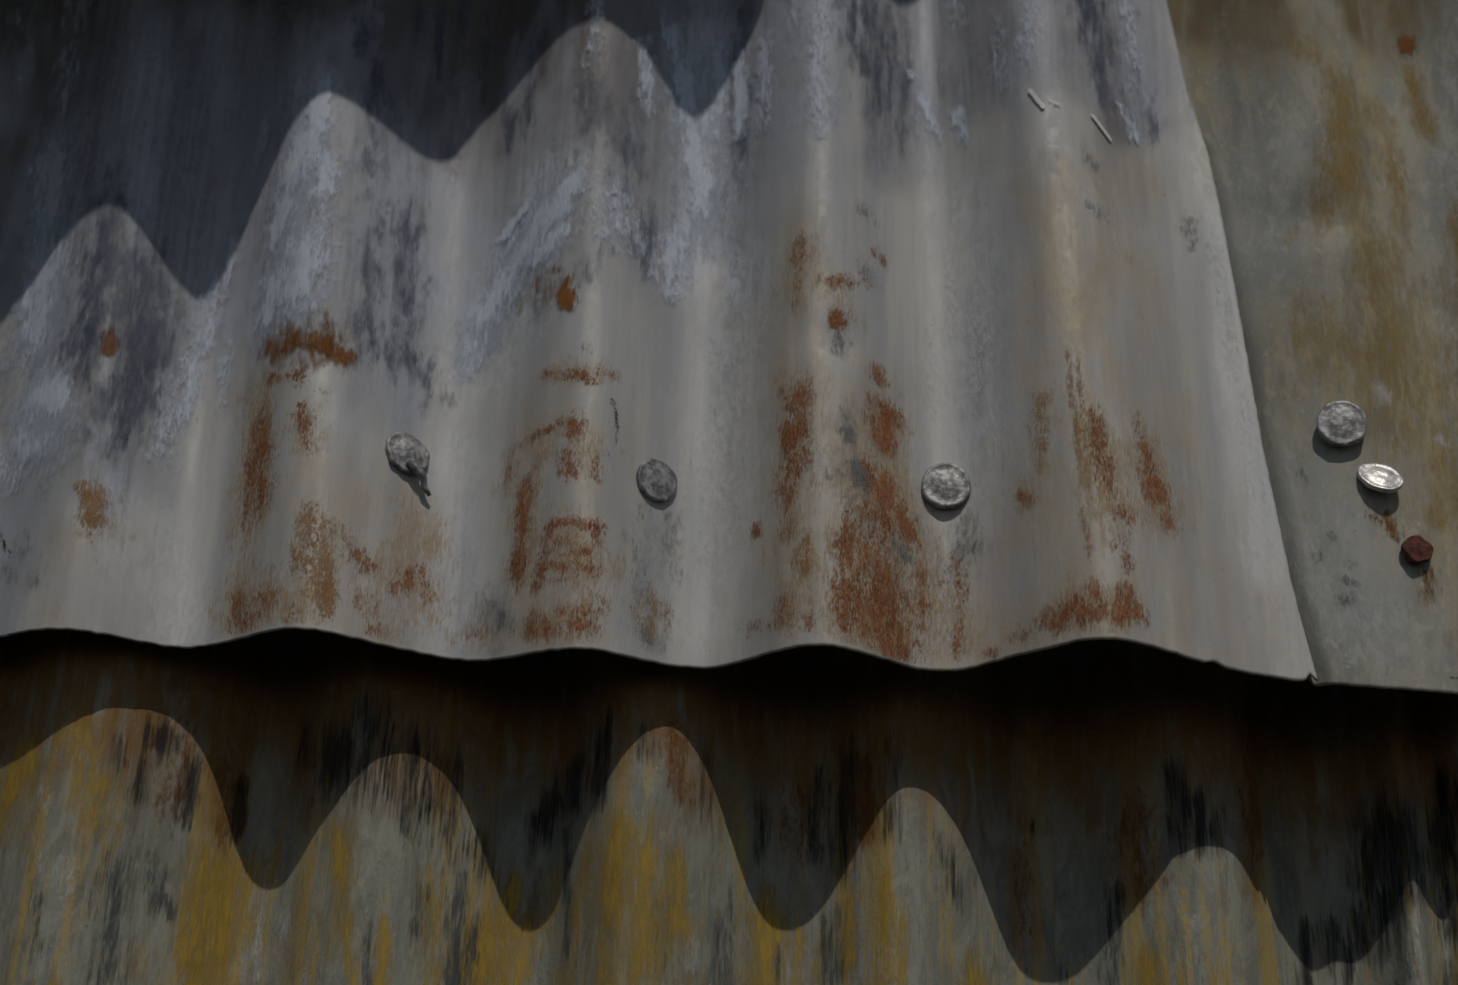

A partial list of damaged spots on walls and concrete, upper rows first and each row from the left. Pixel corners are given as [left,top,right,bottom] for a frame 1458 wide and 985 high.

rust [535,266,578,311]
rust [791,235,871,336]
rust [233,312,357,546]
rust [74,480,107,534]
rust [209,502,451,635]
rust [502,410,624,642]
rust [747,350,1182,663]